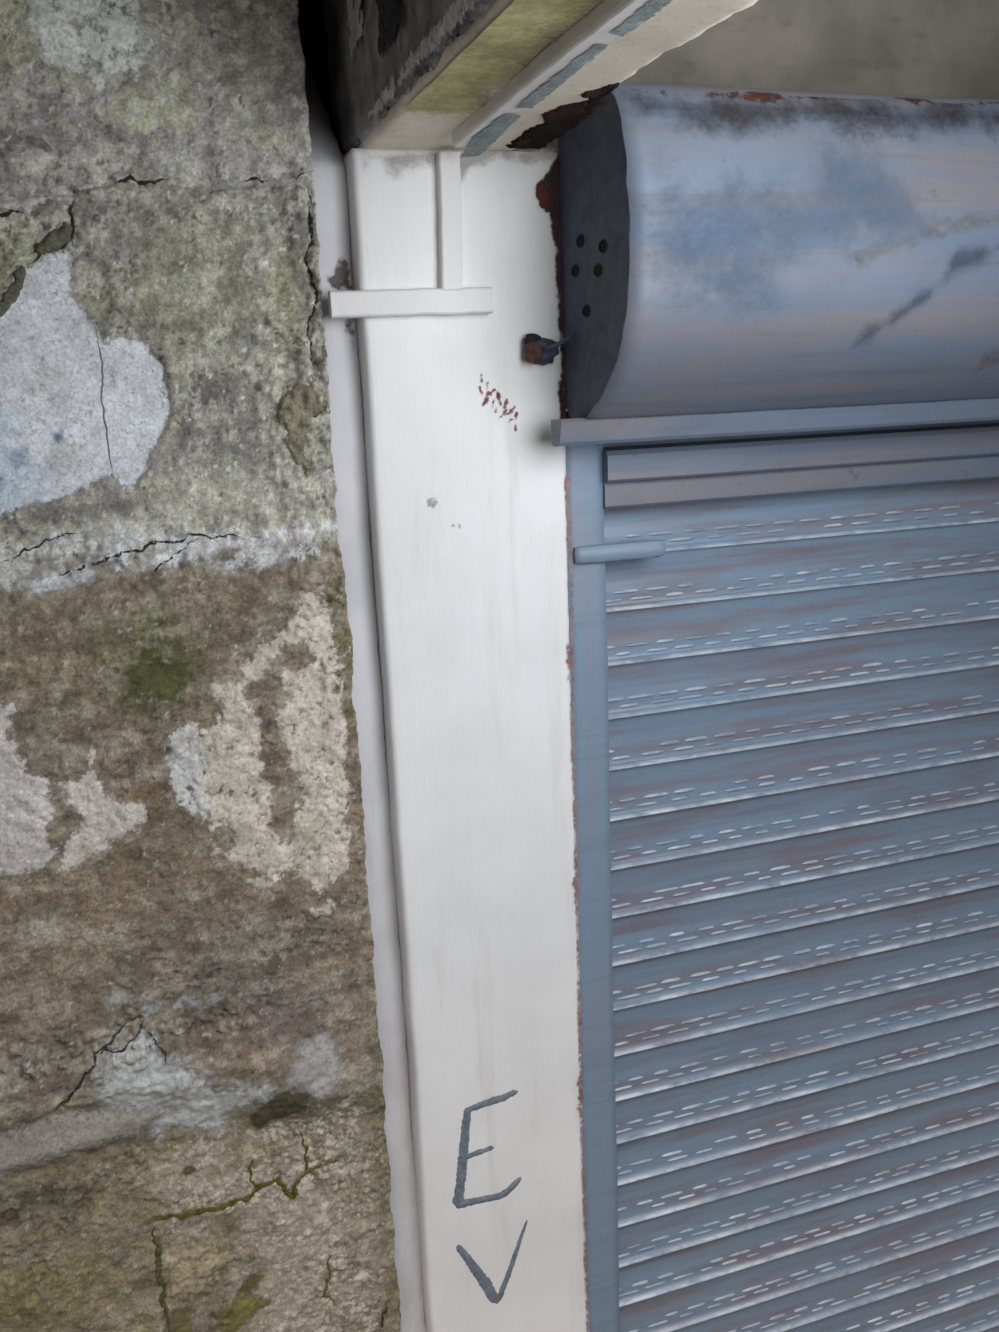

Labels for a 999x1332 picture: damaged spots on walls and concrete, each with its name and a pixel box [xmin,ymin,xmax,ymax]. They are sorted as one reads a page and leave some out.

crack [0,209,23,218]
crack [27,192,75,266]
spalling [0,221,172,516]
crack [115,174,170,186]
corrosion [536,157,570,419]
crack [3,531,260,580]
peeling [0,702,148,877]
peeling [164,591,354,918]
crack [144,1127,339,1332]
peeling [159,1071,398,1332]